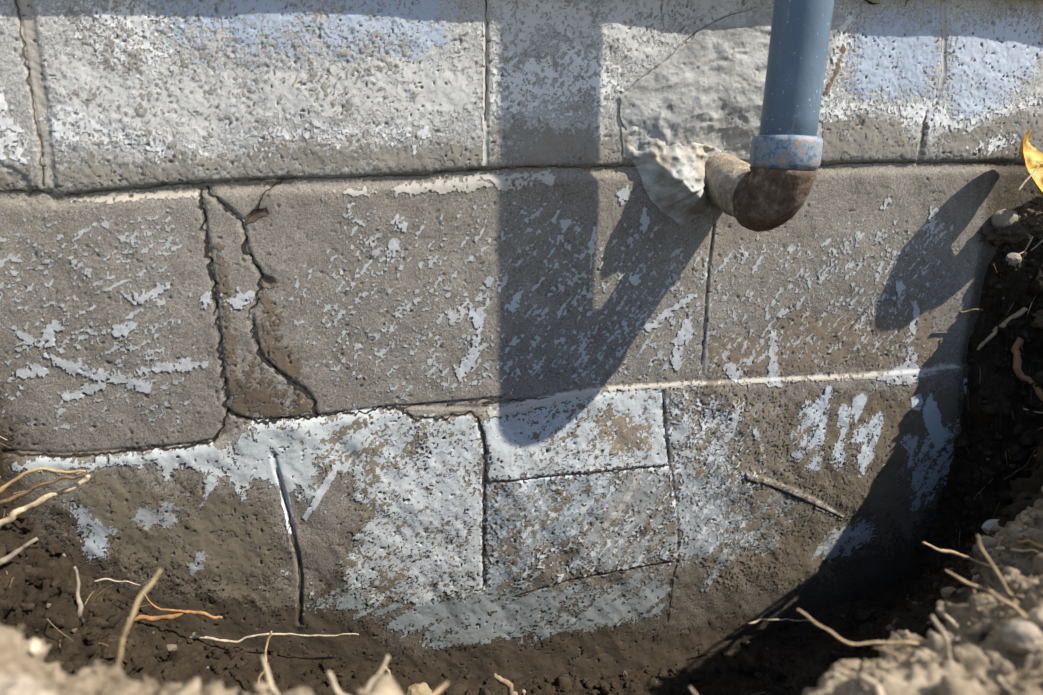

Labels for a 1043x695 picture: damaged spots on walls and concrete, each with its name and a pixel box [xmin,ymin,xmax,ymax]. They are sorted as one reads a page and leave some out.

peeling [0,0,772,166]
peeling [613,185,634,205]
crack [1,0,669,586]
peeling [0,189,960,650]
crack [276,470,302,619]
crack [517,561,677,623]